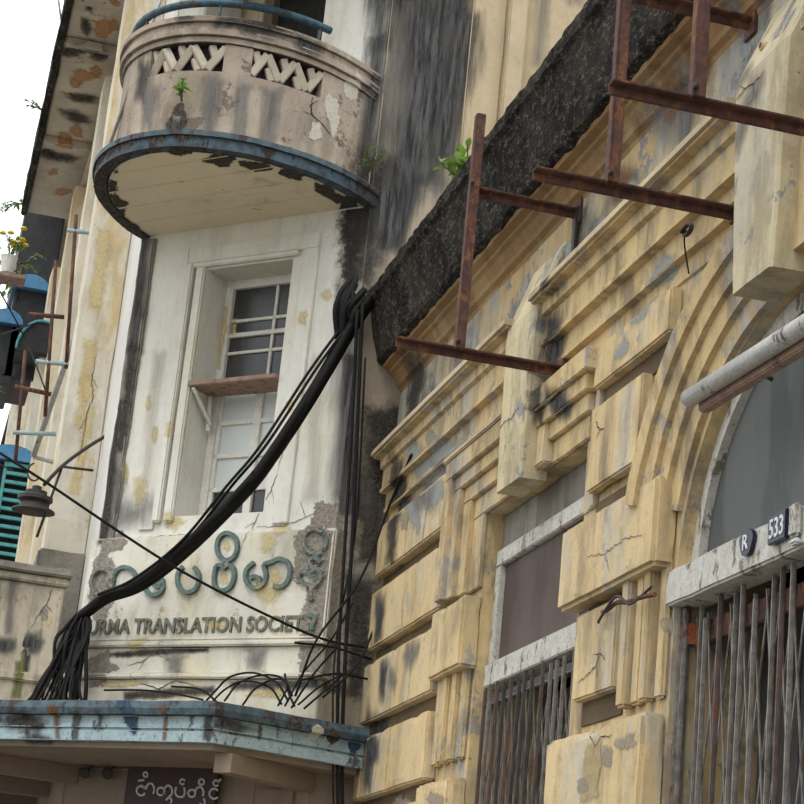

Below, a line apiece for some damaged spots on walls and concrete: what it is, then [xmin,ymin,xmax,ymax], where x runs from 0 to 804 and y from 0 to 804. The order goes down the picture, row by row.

peeling [93,140,147,246]
peeling [143,102,359,209]
leakage [340,0,478,287]
crack [78,357,98,460]
peeling [93,601,114,628]
peeling [87,530,128,602]
peeling [263,500,373,686]
crack [588,535,641,570]
peeling [88,649,145,688]
leakage [379,660,387,698]
corrosion [48,707,60,738]
leakage [362,714,387,789]